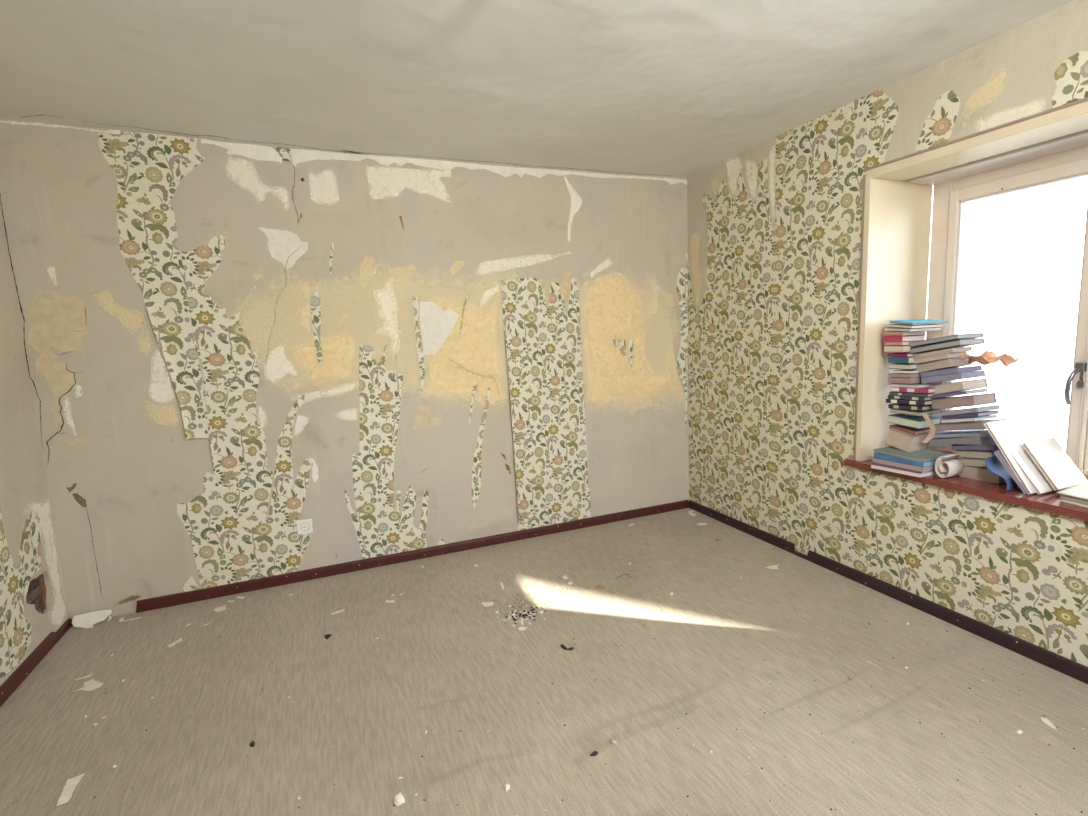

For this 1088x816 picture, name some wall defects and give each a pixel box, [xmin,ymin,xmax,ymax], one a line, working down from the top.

crack [0,194,87,466]
peeling [419,301,459,355]